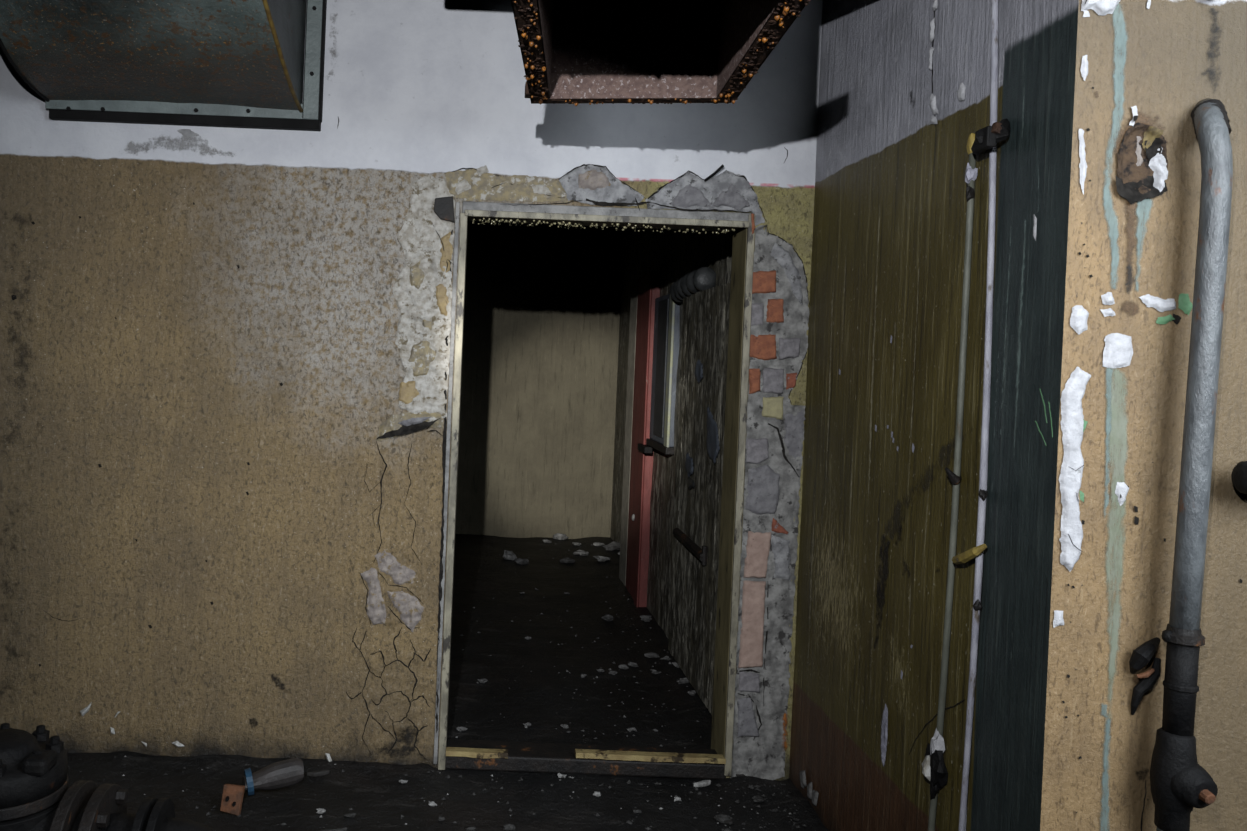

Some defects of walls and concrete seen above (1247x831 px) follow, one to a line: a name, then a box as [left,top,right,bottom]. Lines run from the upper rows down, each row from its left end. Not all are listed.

rust [1125,202,1137,292]
peeling [1103,333,1133,368]
peeling [1070,292,1193,335]
crack [365,441,420,563]
flaking render [393,164,819,806]
peeling [1059,367,1091,588]
peeling [360,550,425,632]
crack [346,628,431,760]